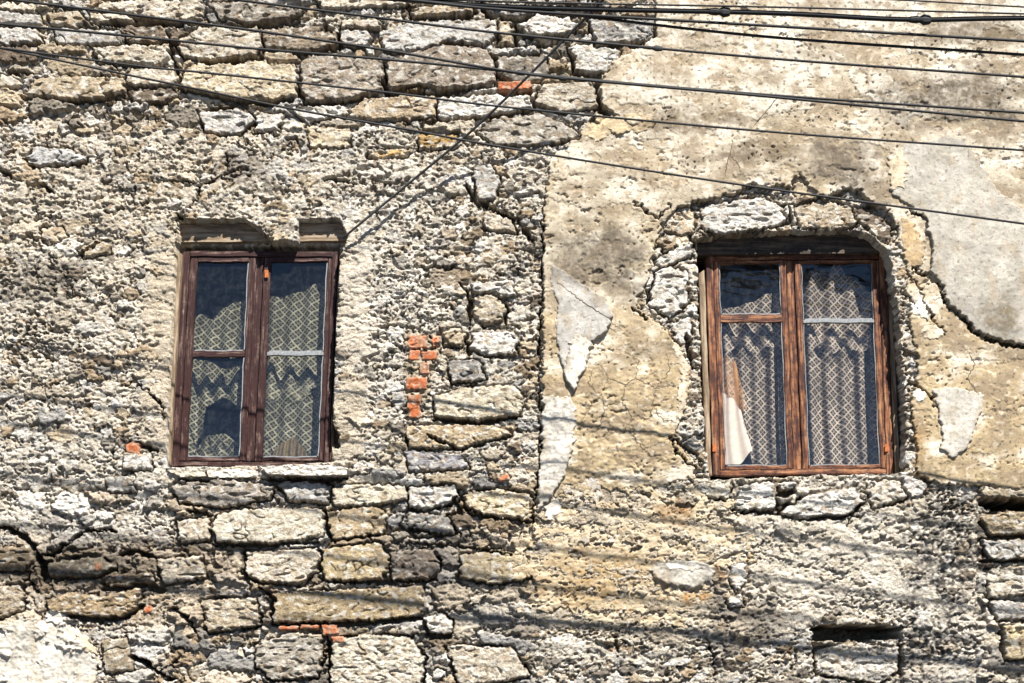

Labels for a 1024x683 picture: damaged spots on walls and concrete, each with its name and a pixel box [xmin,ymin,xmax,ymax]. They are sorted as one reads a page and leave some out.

spalling [580,109,654,144]
crack [483,203,692,529]
spalling [640,134,1024,484]